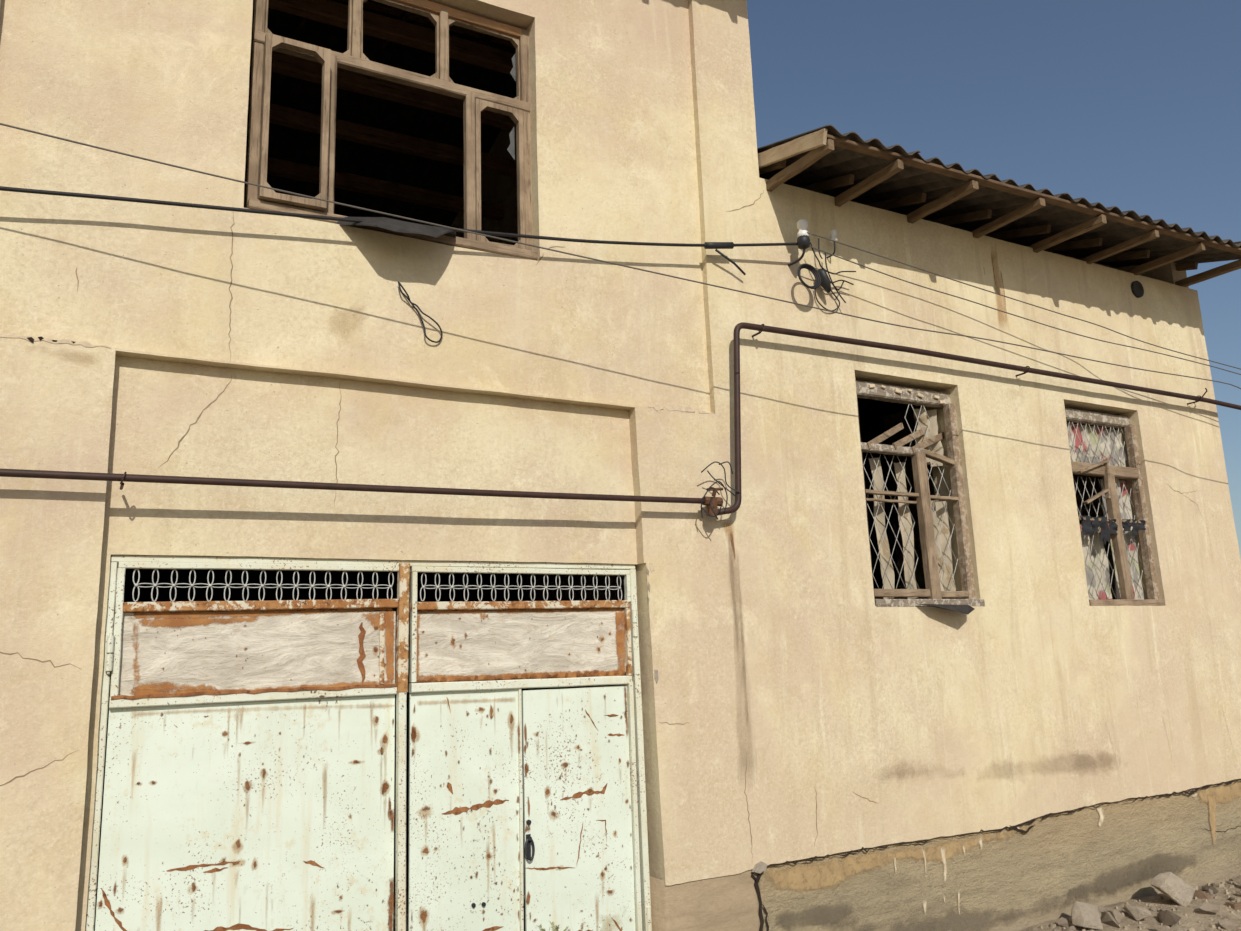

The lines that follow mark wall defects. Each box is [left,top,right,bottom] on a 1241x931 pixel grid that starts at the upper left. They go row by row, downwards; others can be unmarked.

crack [157,216,234,469]
crack [0,652,76,668]
crack [0,750,78,786]
corrosion [416,608,628,931]
corrosion [383,779,394,830]
corrosion [162,840,256,891]
flaking render [768,827,1034,891]
corrosion [99,884,128,931]
corrosion [204,923,293,931]
corrosion [369,880,394,931]